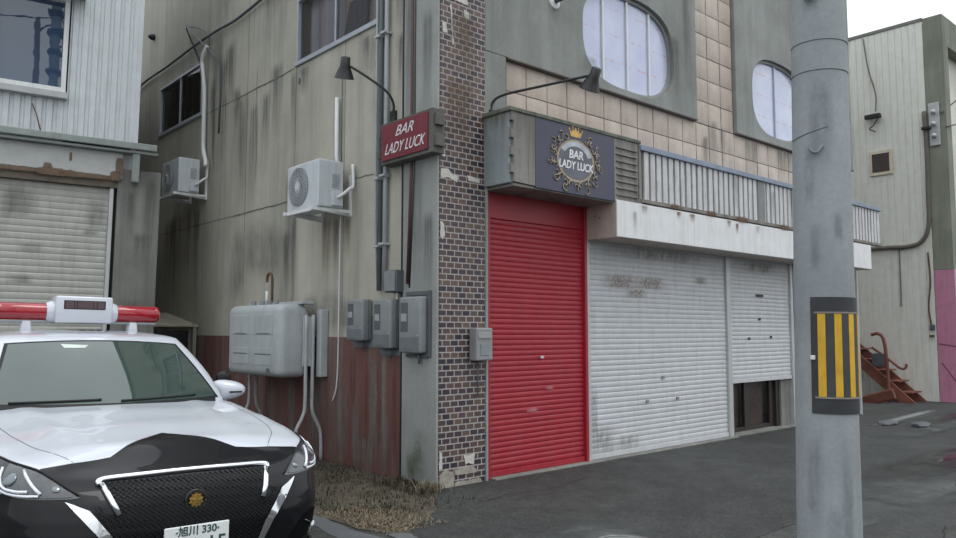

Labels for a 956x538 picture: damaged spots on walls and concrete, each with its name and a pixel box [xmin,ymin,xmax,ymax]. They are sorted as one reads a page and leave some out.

peeling [0,163,110,179]